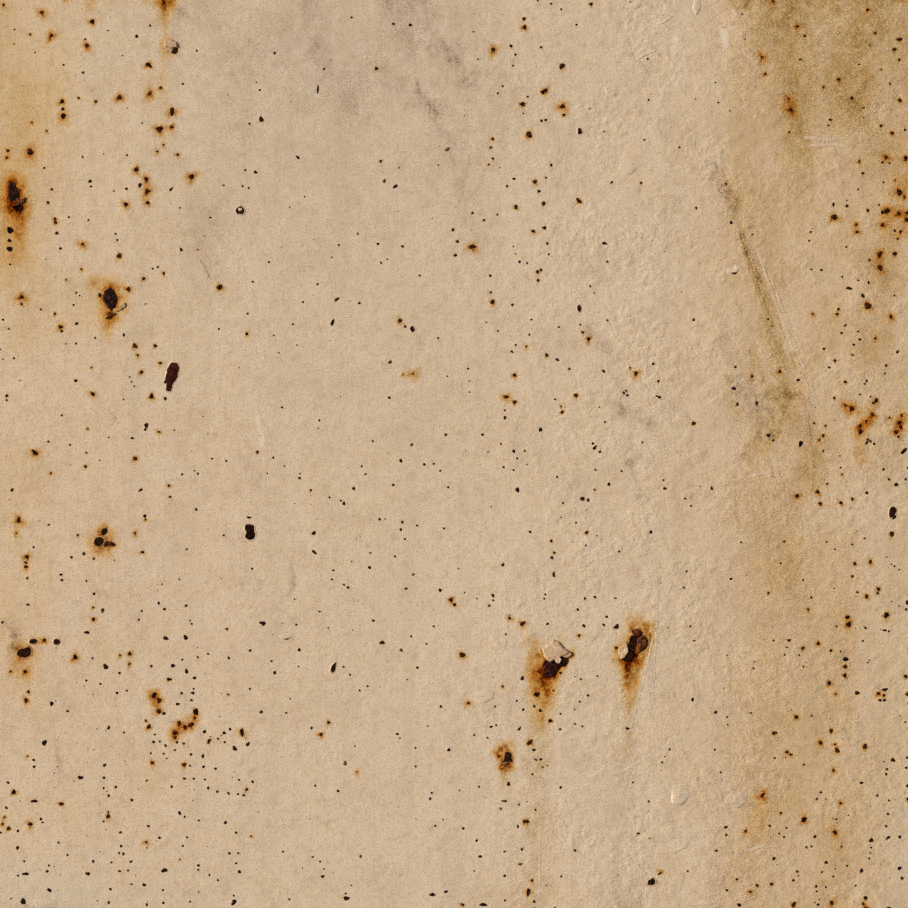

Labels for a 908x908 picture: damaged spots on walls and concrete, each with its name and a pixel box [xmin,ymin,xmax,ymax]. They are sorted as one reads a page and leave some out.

rust [810,155,908,309]
rust [492,669,598,776]